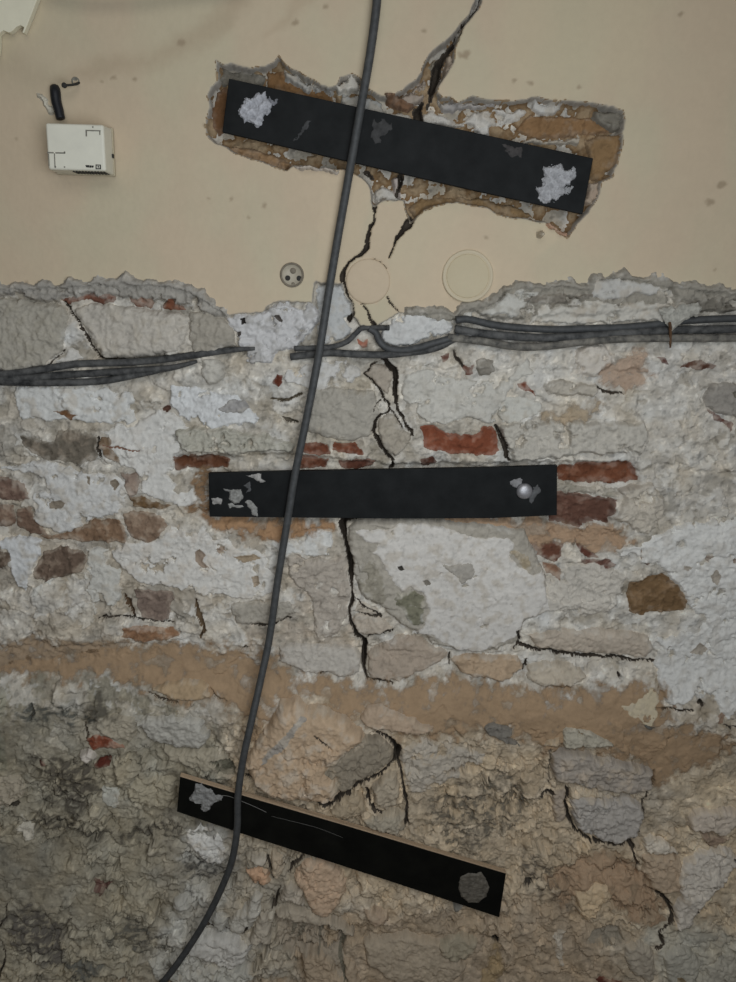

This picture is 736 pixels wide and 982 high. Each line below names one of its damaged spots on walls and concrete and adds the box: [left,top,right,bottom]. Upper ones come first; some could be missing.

spalling [204,0,625,239]
crack [411,0,480,121]
spalling [0,270,368,364]
crack [340,171,414,325]
spalling [380,267,736,347]
crack [363,358,414,468]
peeling [0,385,392,643]
flaking render [548,460,638,527]
crack [338,518,393,685]
crack [513,630,655,679]
peeling [531,517,736,730]
crack [318,731,410,826]